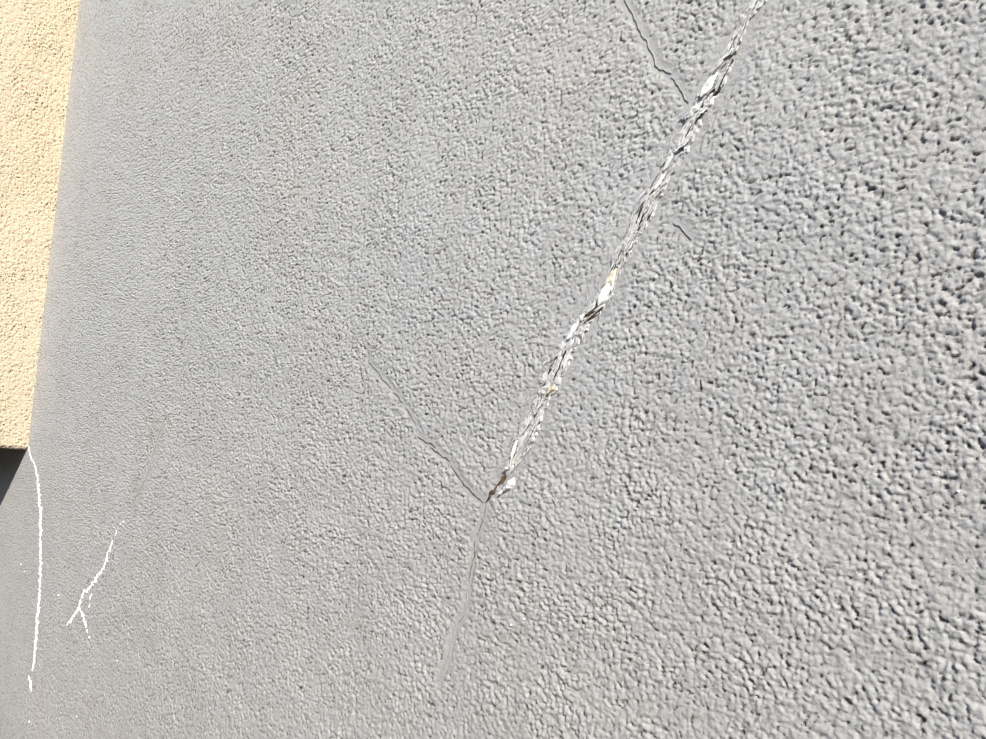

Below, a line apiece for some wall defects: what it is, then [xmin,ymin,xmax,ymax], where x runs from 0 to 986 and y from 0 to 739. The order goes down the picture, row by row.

crack [367,0,768,681]
crack [27,446,43,692]
crack [66,425,163,638]